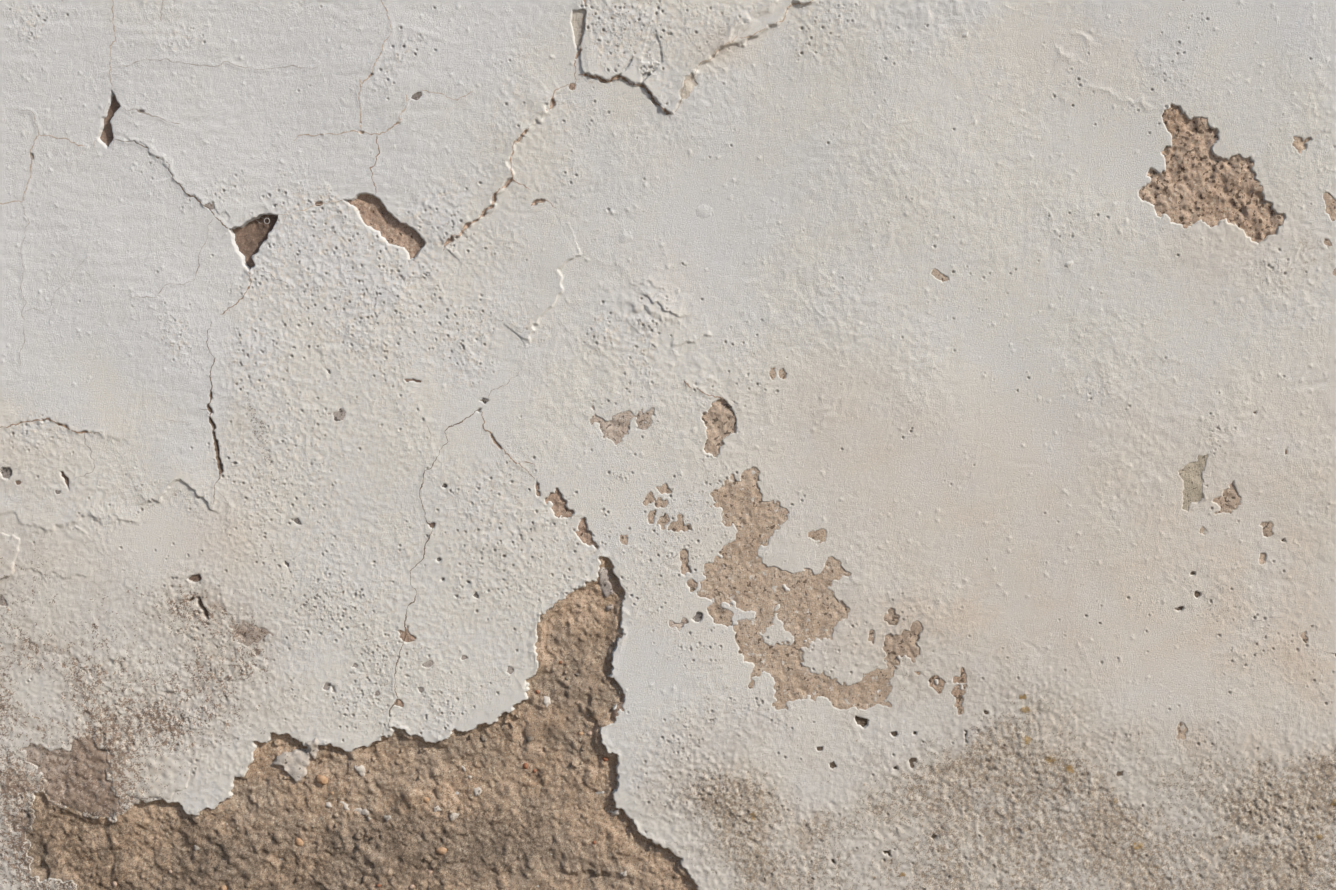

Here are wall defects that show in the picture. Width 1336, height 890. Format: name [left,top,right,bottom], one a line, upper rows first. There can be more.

crack [0,0,300,363]
spalling [232,215,278,269]
spalling [347,194,425,259]
crack [443,0,813,251]
peeling [1139,105,1285,243]
crack [0,418,98,477]
damp [0,550,272,890]
crack [166,270,288,538]
flaking render [21,483,697,890]
crack [389,370,535,722]
peeling [669,467,967,727]
damp [651,686,1336,890]